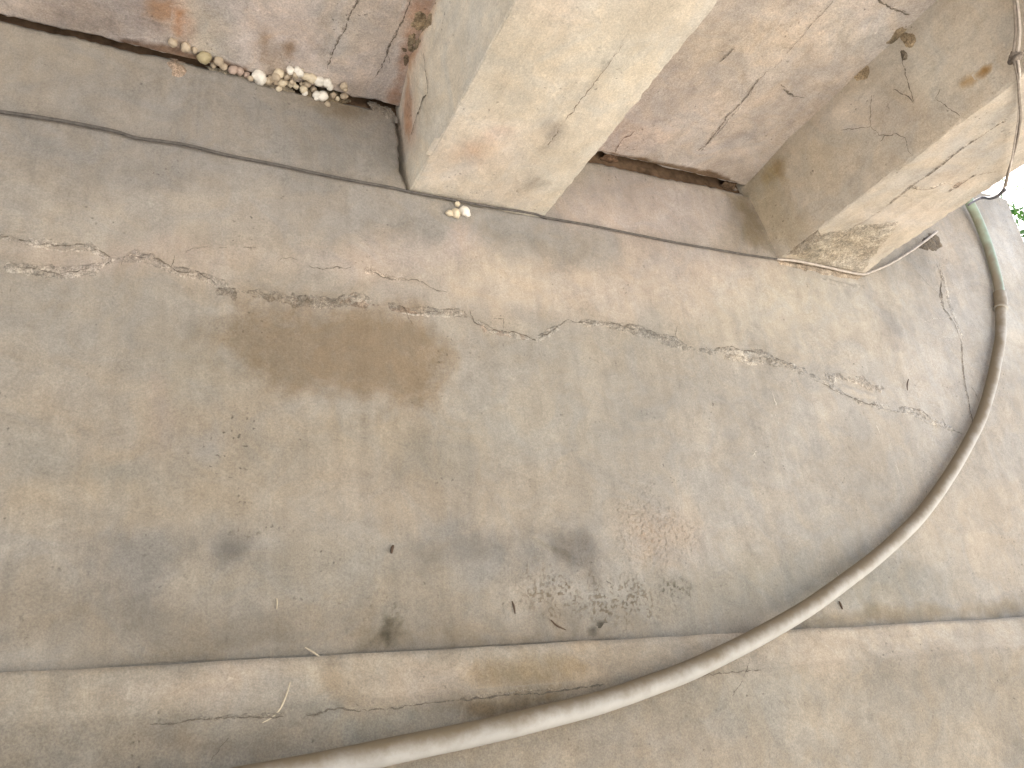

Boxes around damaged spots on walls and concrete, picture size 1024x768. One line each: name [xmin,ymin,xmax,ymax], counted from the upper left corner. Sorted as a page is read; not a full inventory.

leakage [251,20,302,68]
crack [327,0,360,69]
crack [376,0,411,76]
crack [548,44,624,145]
crack [696,1,833,151]
crack [843,61,960,154]
crack [837,117,1009,241]
leakage [176,273,470,442]
crack [0,232,977,435]